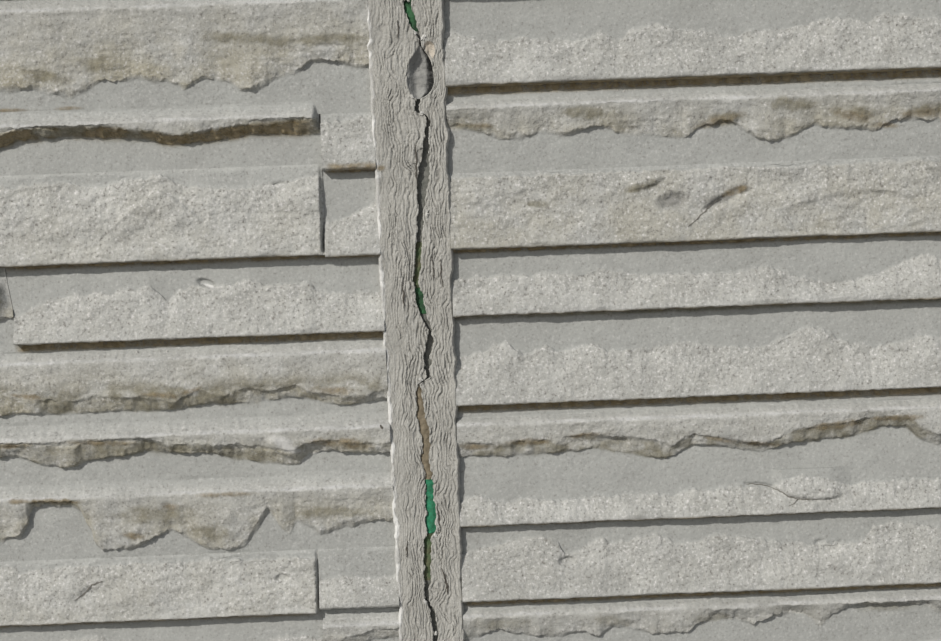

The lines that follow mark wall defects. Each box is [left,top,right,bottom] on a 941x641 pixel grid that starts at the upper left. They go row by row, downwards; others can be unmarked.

crack [397,0,426,46]
crack [402,95,449,641]